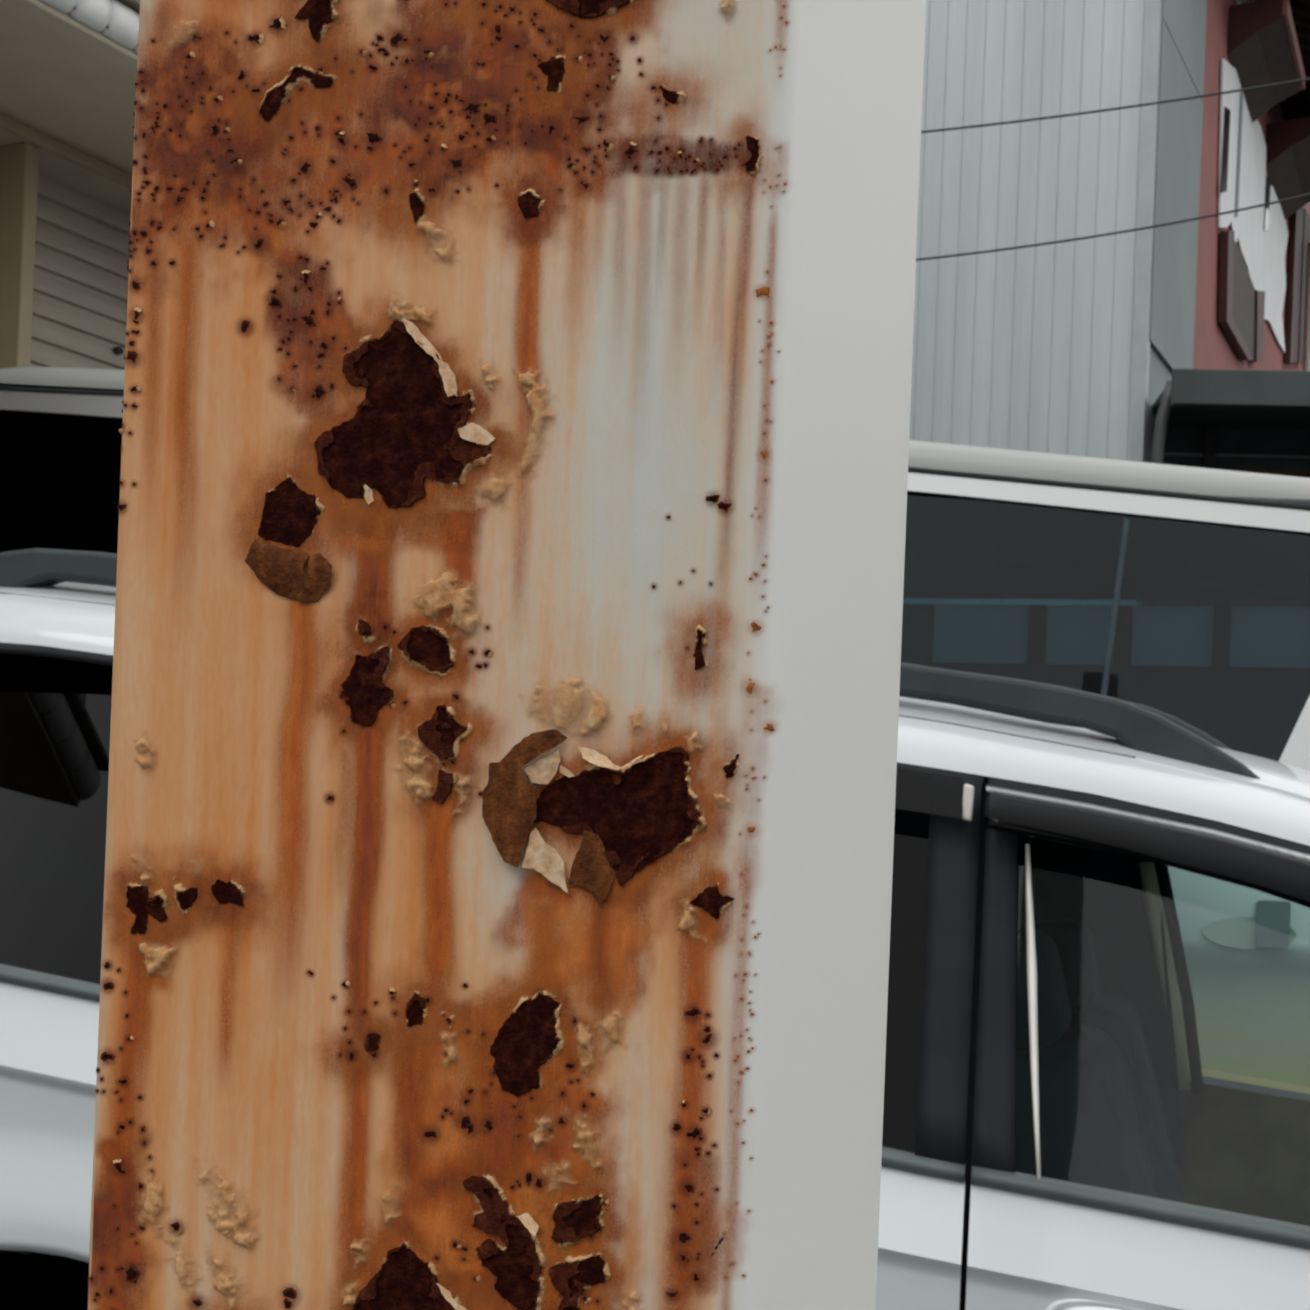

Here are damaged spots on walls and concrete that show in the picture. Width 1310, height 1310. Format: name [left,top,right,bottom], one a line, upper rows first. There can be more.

corrosion [130,0,744,510]
spalling [130,0,787,253]
peeling [242,254,513,603]
peeling [115,860,253,949]
corrosion [343,724,383,1026]
corrosion [423,795,454,988]
peeling [324,605,720,904]
corrosion [88,915,167,1310]
peeling [339,1224,472,1310]
peeling [338,982,588,1140]
corrosion [339,865,652,1310]
corrosion [664,924,713,1310]